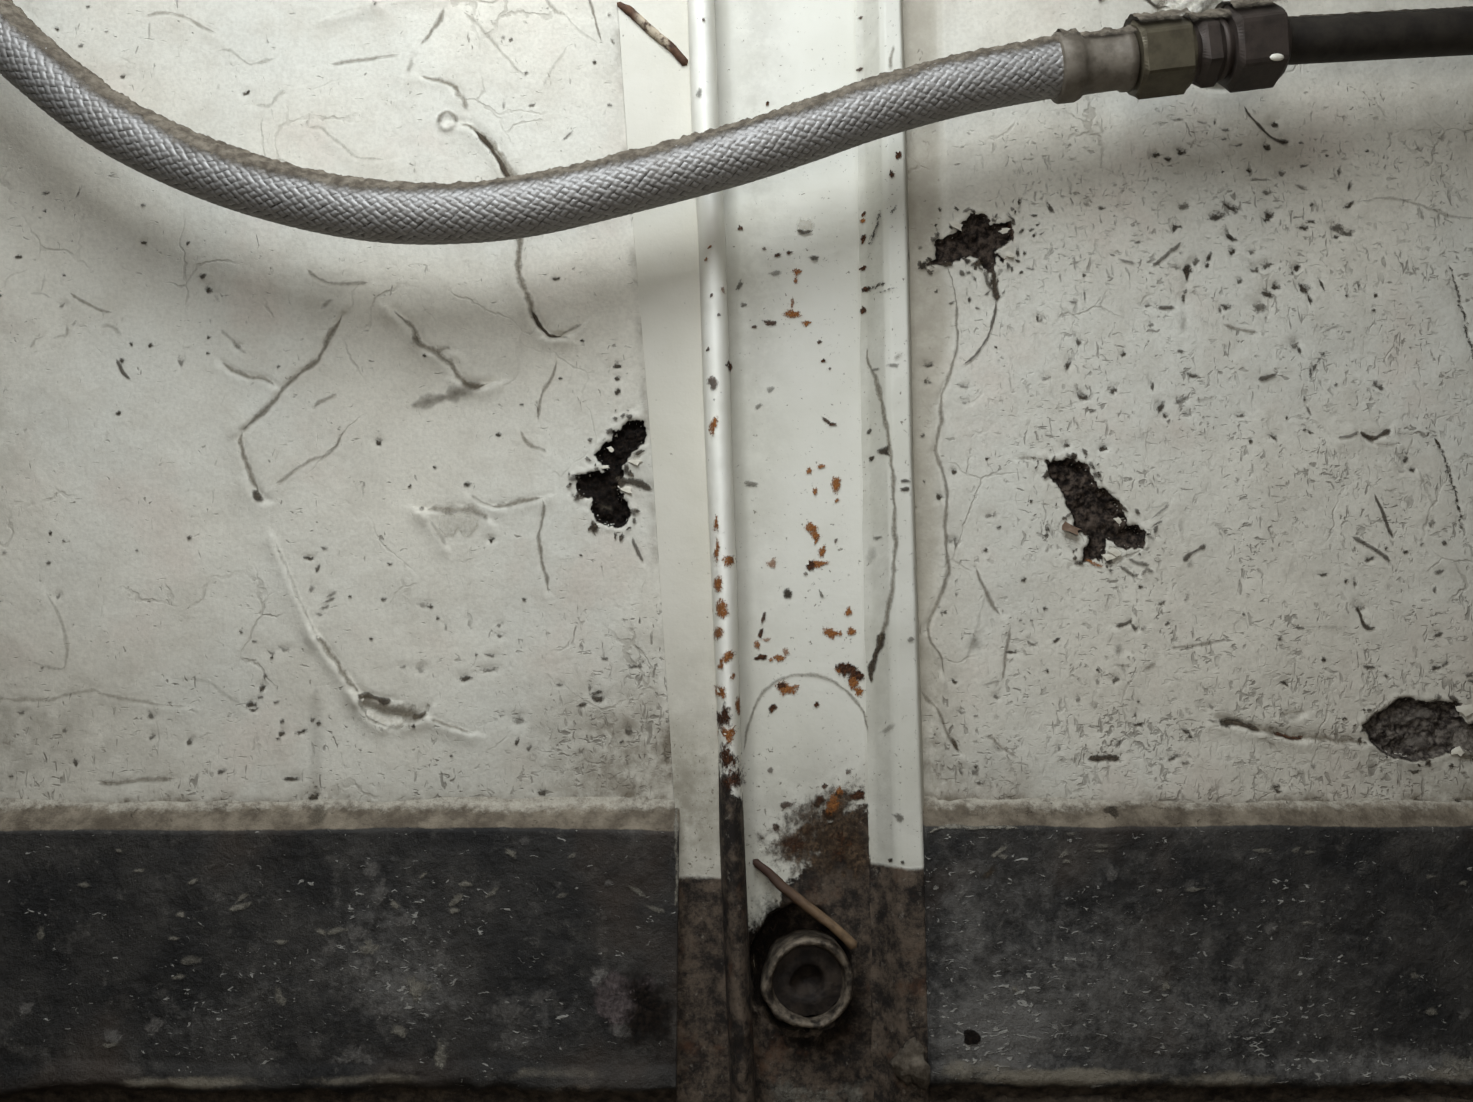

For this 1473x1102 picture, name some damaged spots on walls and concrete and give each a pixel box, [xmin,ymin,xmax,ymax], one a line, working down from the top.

crack [424,76,515,177]
flaking render [918,199,1054,309]
crack [226,319,341,501]
crack [396,313,485,405]
crack [516,238,578,447]
flaking render [566,364,651,561]
corrosion [804,522,838,575]
flaking render [1022,443,1167,588]
corrosion [712,514,746,790]
corrosion [835,662,865,697]
flaking render [1342,673,1473,774]
corrosion [760,769,904,877]